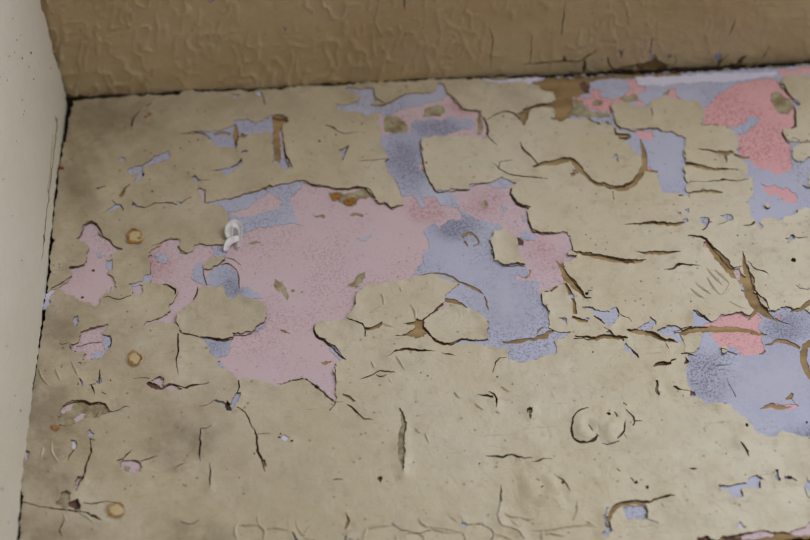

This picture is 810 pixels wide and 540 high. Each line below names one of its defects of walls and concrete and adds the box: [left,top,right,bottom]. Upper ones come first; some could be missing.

crack [514,104,658,200]
peeling [482,41,810,228]
crack [17,430,118,540]
peeling [43,222,123,311]
peeling [58,371,110,427]
peeling [70,316,112,365]
crack [33,83,362,389]
peeling [130,83,577,411]
crack [398,408,407,470]
crack [602,496,669,537]
crack [541,219,810,367]
peeling [683,307,810,438]